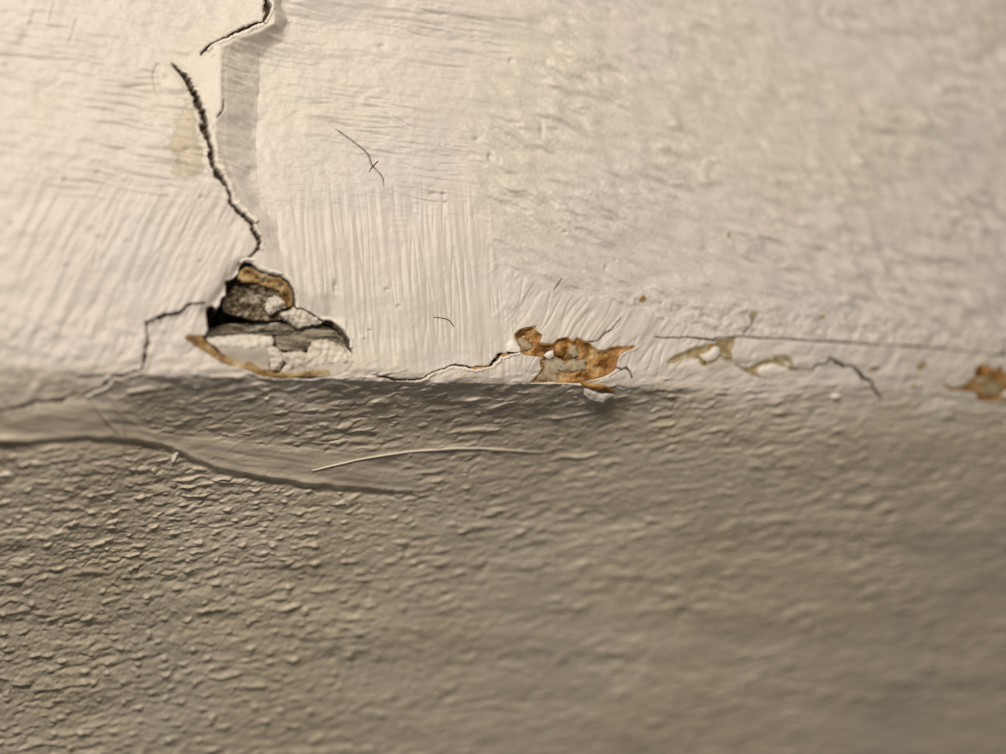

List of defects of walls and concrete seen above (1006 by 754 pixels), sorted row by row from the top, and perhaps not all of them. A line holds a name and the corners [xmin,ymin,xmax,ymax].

crack [171,0,276,265]
crack [0,301,205,413]
spalling [185,257,377,381]
crack [374,351,520,386]
peeling [499,326,644,403]
peeling [667,338,814,379]
crack [655,318,1006,400]